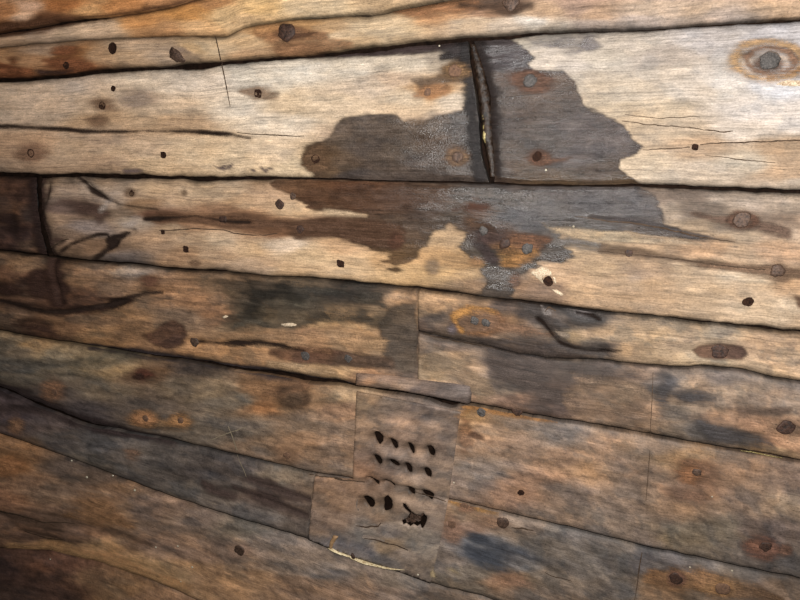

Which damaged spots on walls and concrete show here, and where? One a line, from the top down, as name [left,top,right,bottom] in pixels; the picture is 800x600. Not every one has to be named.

damp [544,35,599,53]
corrosion [414,62,472,98]
damp [0,177,133,317]
damp [146,40,772,421]
corrosion [465,204,552,267]
crack [536,307,620,351]
damp [89,344,335,382]
damp [697,420,772,446]